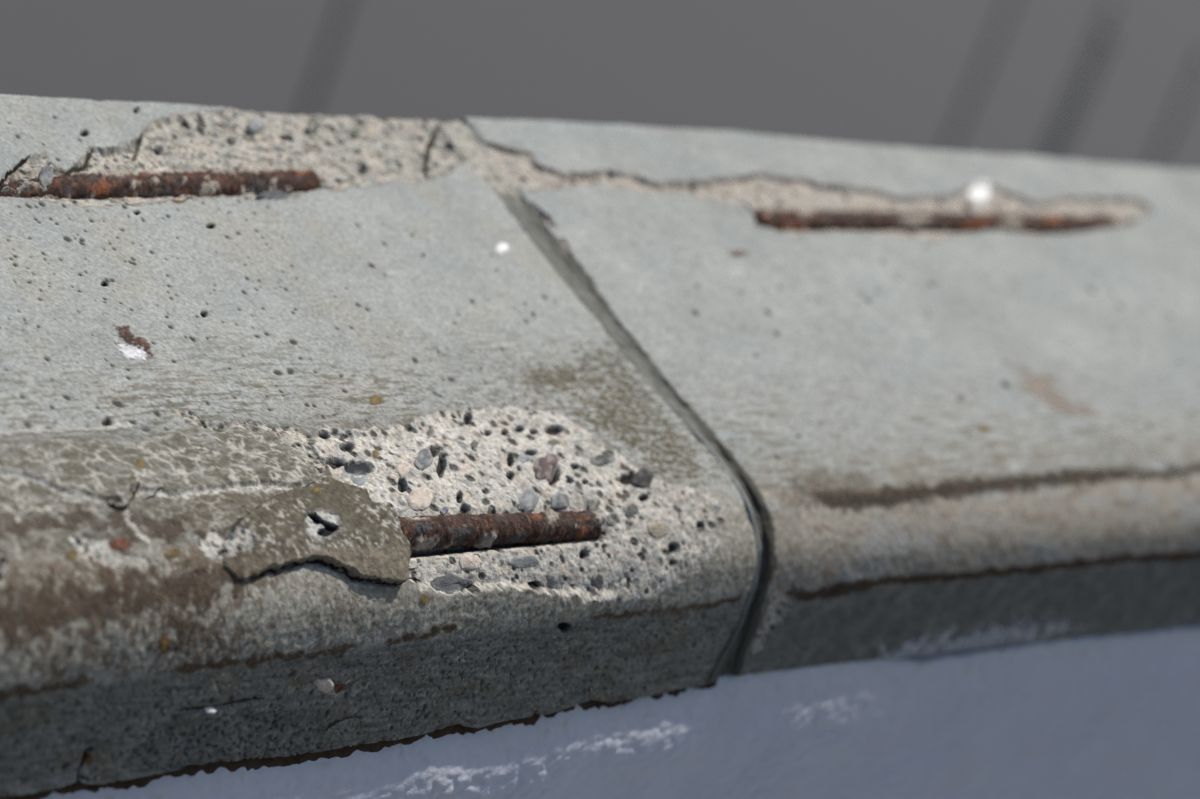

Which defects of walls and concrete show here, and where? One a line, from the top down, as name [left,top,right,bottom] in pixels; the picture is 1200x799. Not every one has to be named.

spalling [0,107,466,215]
spalling [482,141,1153,289]
rust [116,325,153,360]
spalling [169,404,725,605]
crack [76,748,94,782]
crack [324,716,362,732]